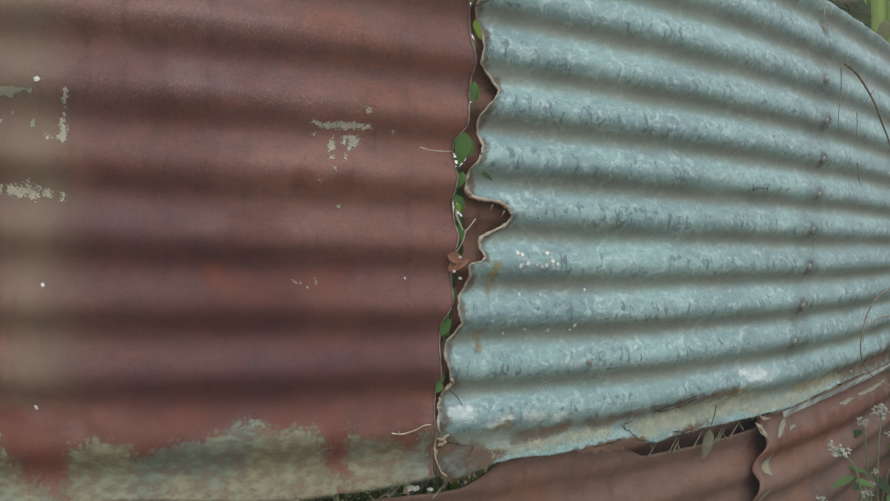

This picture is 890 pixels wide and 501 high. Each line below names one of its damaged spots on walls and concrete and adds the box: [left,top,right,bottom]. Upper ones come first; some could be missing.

peeling [0,76,40,99]
peeling [44,86,70,144]
peeling [310,106,372,172]
peeling [0,178,67,202]
corrosion [431,439,504,480]
corrosion [577,436,647,454]